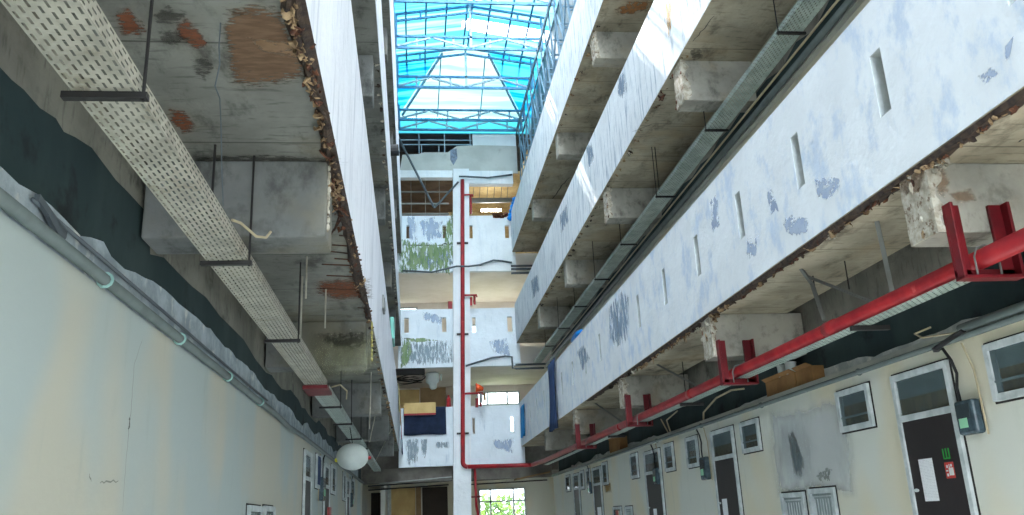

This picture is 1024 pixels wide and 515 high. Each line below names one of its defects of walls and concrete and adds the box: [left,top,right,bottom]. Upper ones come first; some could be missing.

corrosion [116,9,146,35]
corrosion [177,19,207,48]
corrosion [223,4,305,87]
corrosion [169,109,194,134]
spalling [280,0,398,442]
spalling [572,88,1024,435]
corrosion [316,279,372,300]
damp [408,341,452,365]
damp [789,433,803,475]